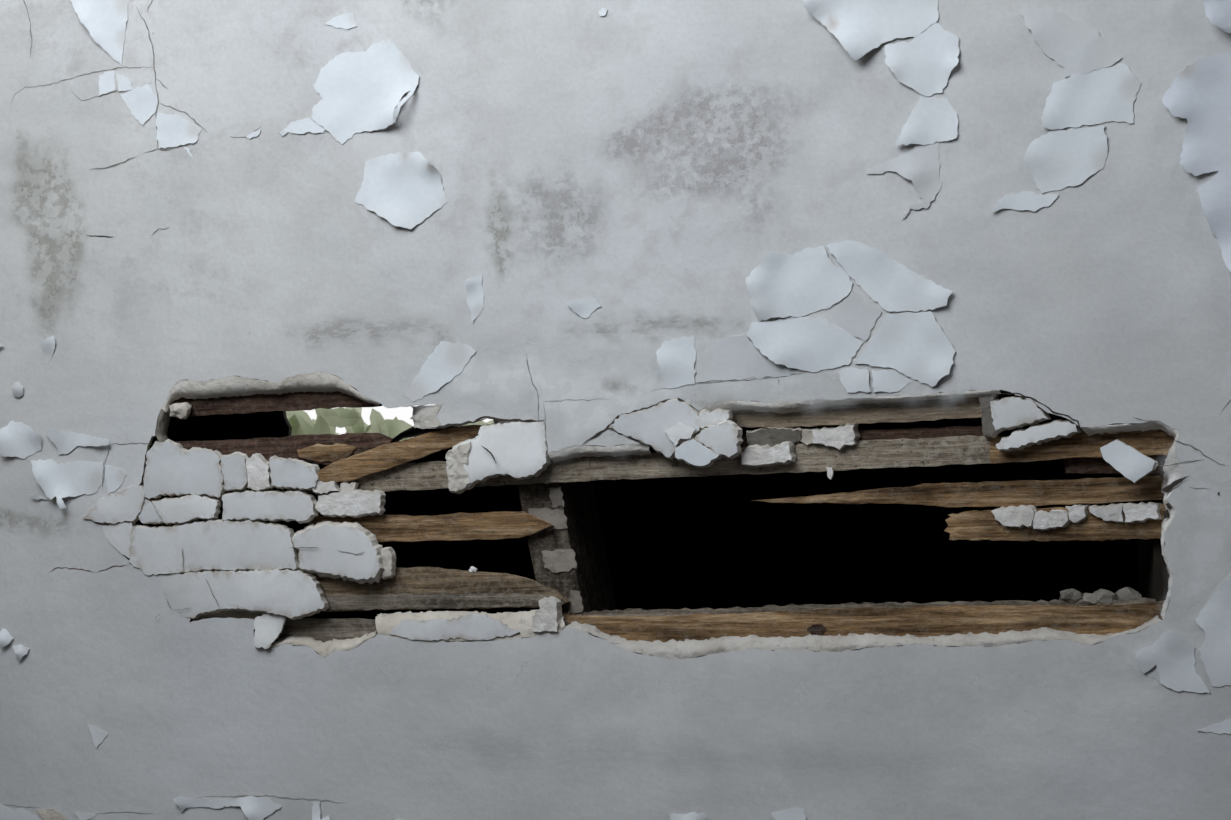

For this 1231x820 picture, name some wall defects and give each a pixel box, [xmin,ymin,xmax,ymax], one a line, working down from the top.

peeling [69,0,201,158]
crack [10,0,279,169]
peeling [280,40,419,144]
peeling [355,151,448,230]
peeling [803,0,960,218]
peeling [991,7,1141,212]
peeling [1162,52,1231,272]
spalling [156,373,380,442]
peeling [651,240,1001,414]
spalling [268,421,1231,693]
crack [97,809,153,817]
crack [197,795,345,803]